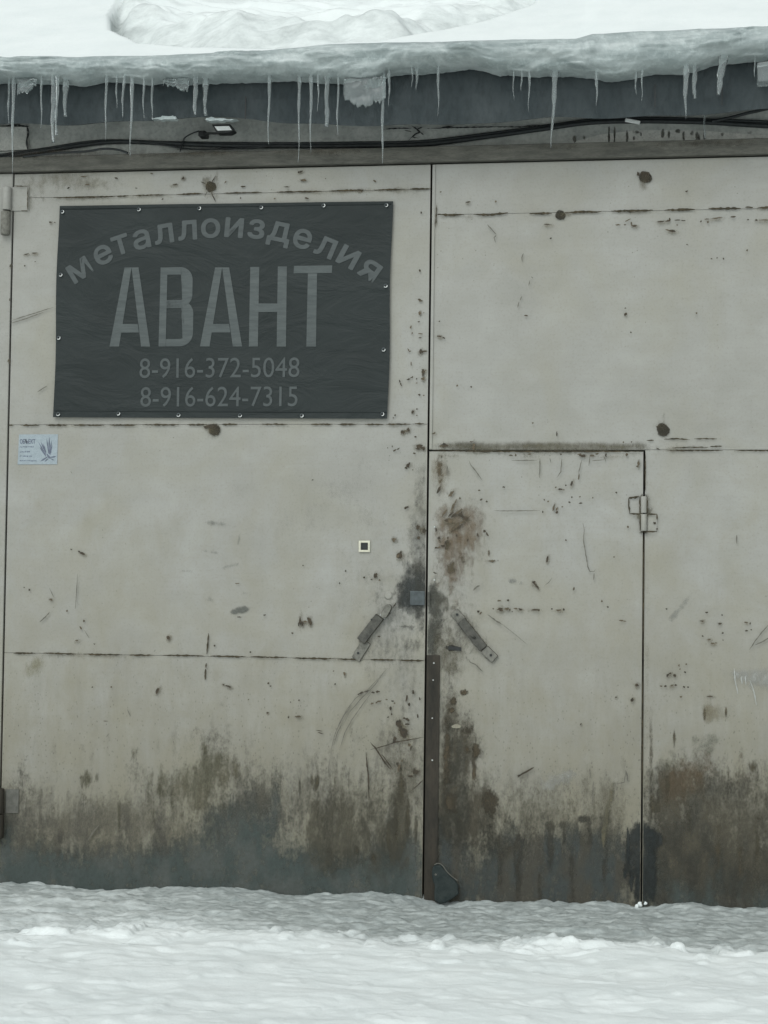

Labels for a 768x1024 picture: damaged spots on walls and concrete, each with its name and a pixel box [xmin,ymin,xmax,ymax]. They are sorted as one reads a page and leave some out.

rust [435,205,508,223]
rust [529,209,651,220]
rust [637,171,652,183]
rust [437,423,723,642]
water stain [0,778,422,899]
water stain [438,815,768,909]